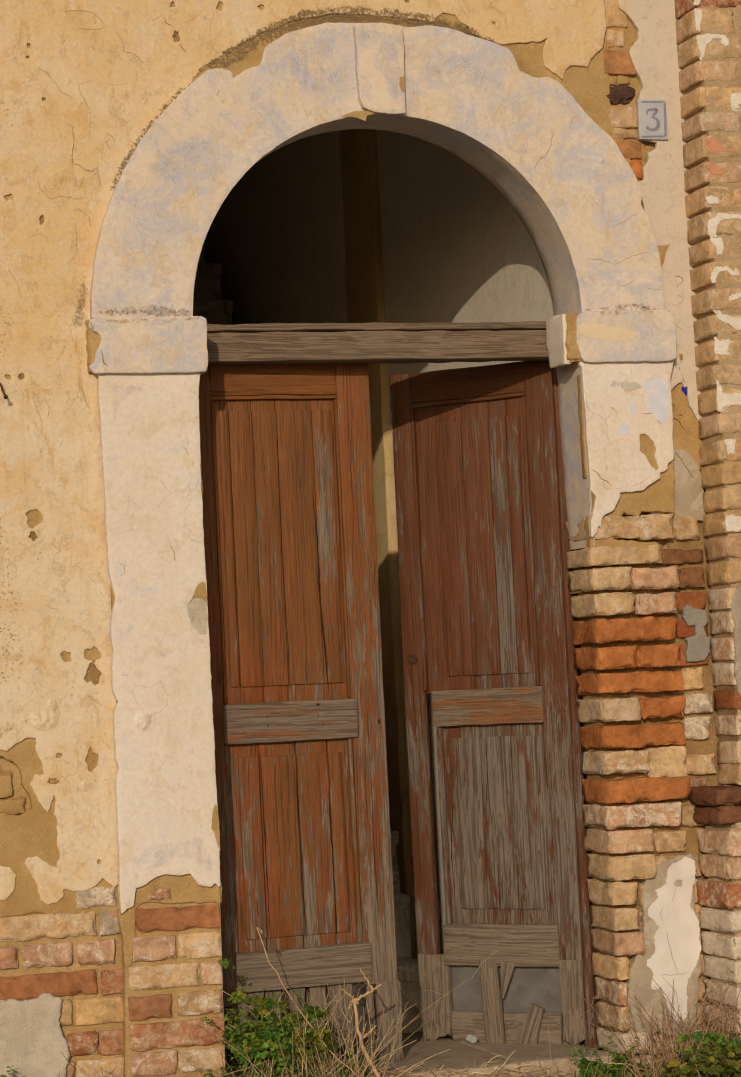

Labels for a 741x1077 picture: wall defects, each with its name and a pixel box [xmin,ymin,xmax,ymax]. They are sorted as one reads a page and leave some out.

flaking render [191,13,479,84]
peeling [339,46,405,121]
flaking render [501,0,645,182]
peeling [693,0,729,61]
peeling [705,191,741,283]
peeling [711,307,741,355]
peeling [716,379,741,412]
peeling [723,514,741,532]
flaking render [187,579,208,635]
flaking render [84,647,102,685]
flaking render [566,375,717,1072]
flaking render [0,738,225,1077]